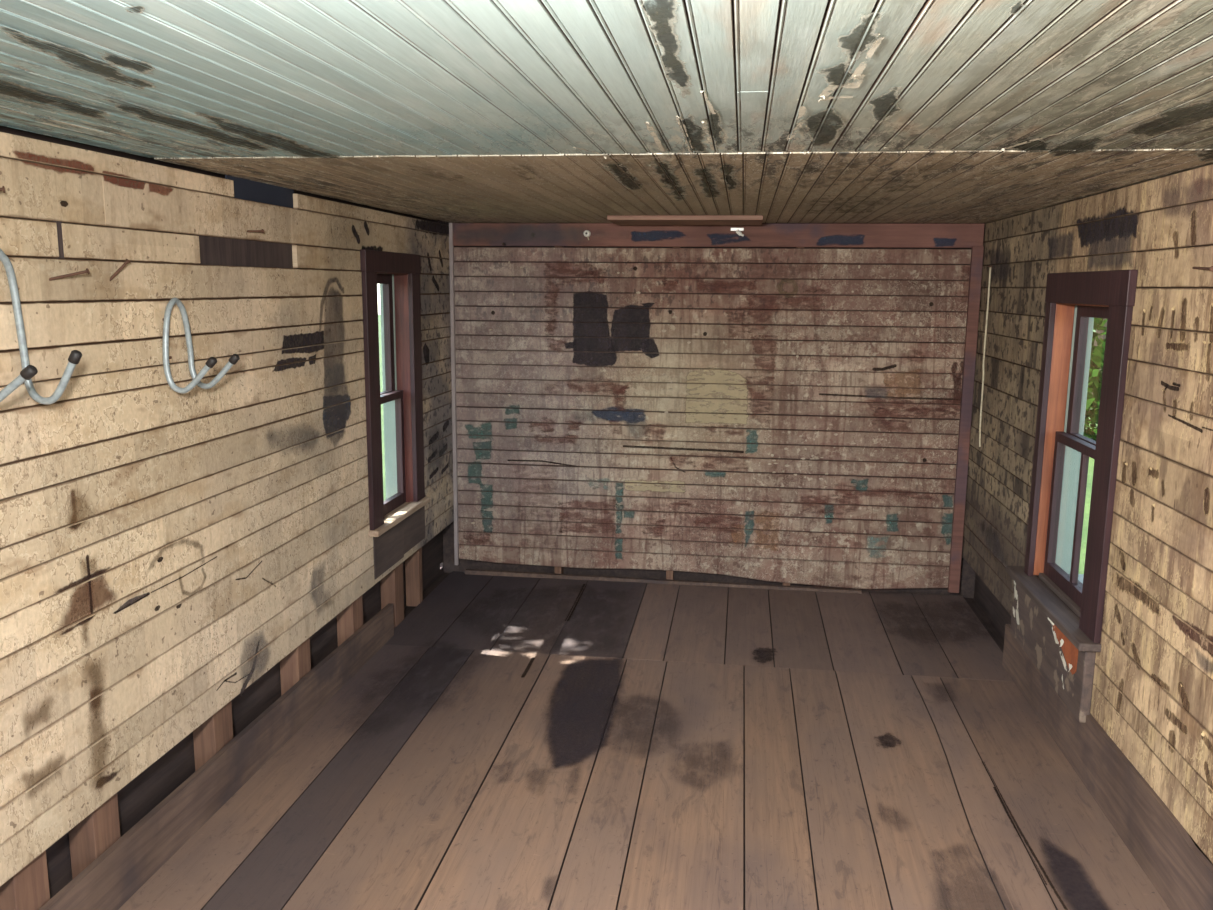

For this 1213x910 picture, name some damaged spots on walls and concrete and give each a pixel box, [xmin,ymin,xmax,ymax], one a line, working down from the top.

leakage [0,26,155,89]
leakage [642,0,691,98]
leakage [819,13,882,85]
leakage [0,80,342,159]
leakage [677,110,726,152]
leakage [804,108,845,146]
leakage [868,87,901,121]
leakage [646,160,738,201]
leakage [1164,184,1209,259]
peeling [1048,618,1078,689]
leakage [549,659,621,767]
leakage [1043,843,1109,910]